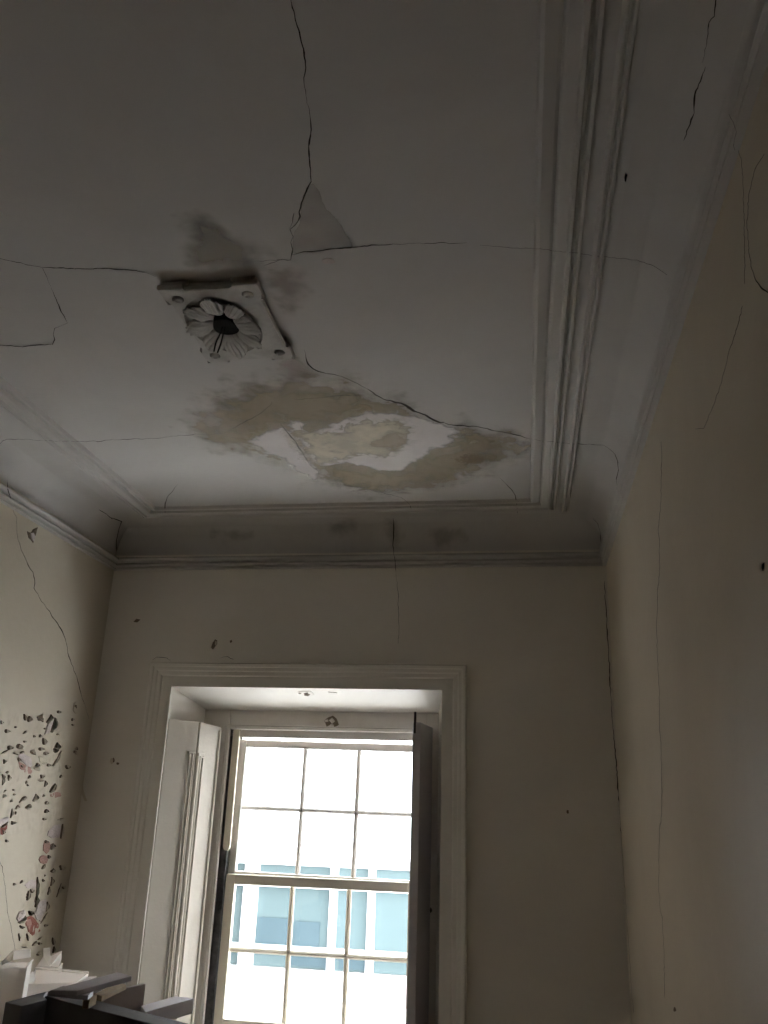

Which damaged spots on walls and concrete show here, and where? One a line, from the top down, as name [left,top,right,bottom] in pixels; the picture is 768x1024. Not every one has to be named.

crack [259,2,667,275]
crack [684,0,716,139]
crack [0,258,156,347]
crack [1,350,619,483]
peeling [248,412,460,479]
leakage [195,374,524,491]
crack [7,483,89,718]
peeling [0,693,83,962]